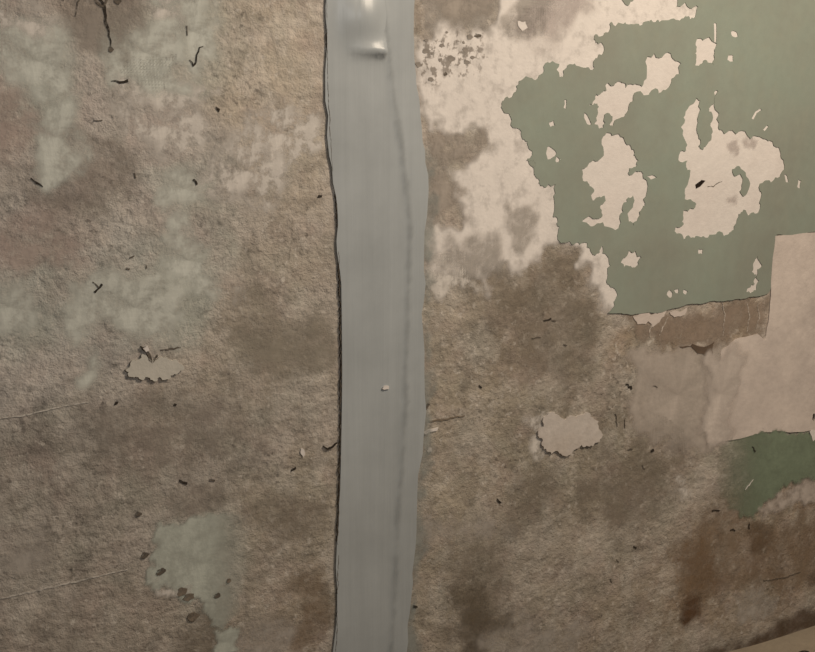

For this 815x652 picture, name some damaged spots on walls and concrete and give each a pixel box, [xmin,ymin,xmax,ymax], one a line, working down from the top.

leakage [73,0,216,154]
peeling [696,23,716,66]
leakage [33,86,90,191]
peeling [415,0,697,282]
peeling [675,90,788,239]
leakage [163,212,216,299]
leakage [425,254,478,299]
peeling [569,242,617,309]
peeling [747,258,761,293]
flaking render [125,346,184,382]
flaking render [525,412,603,460]
peeling [141,514,240,652]